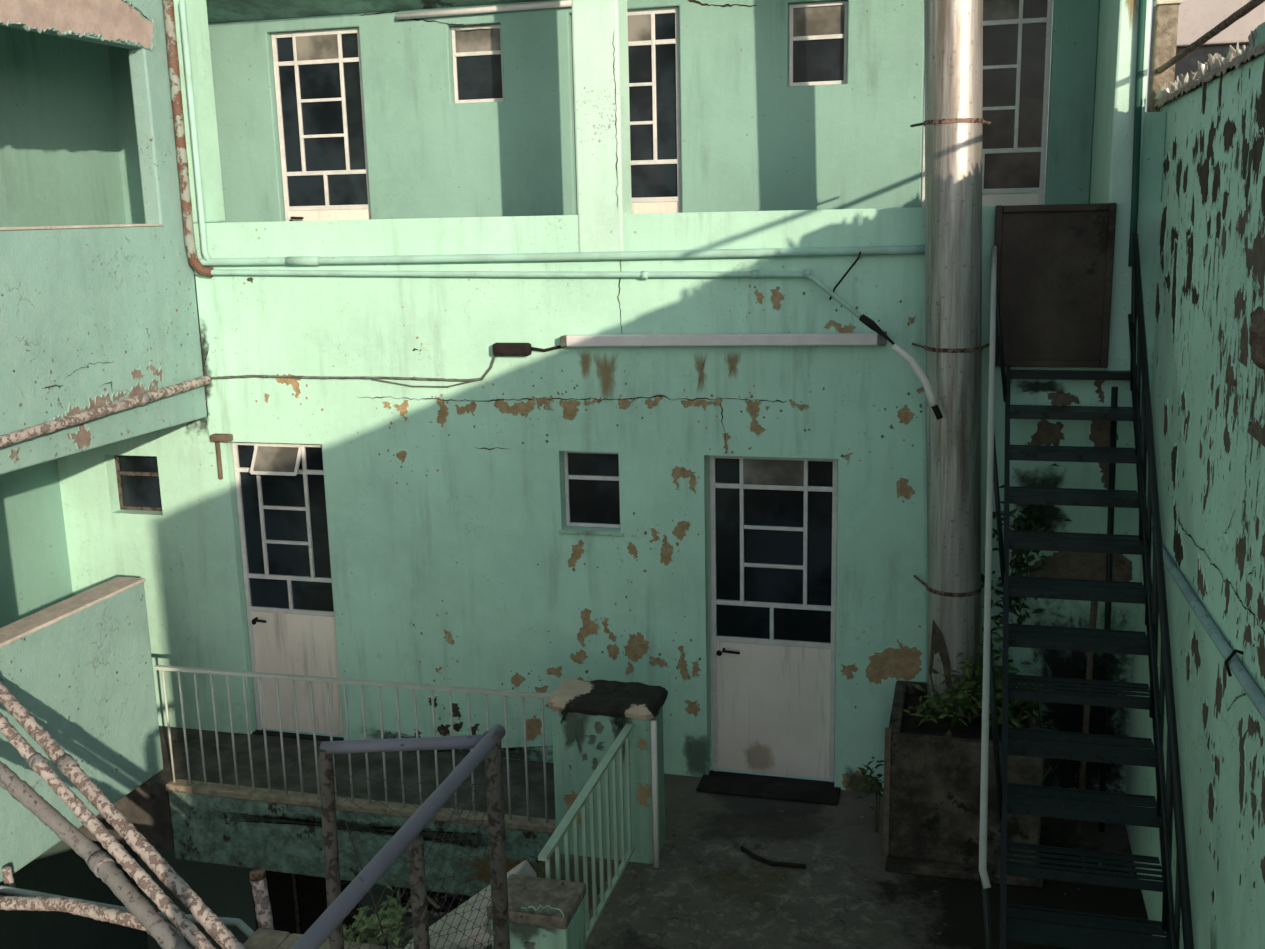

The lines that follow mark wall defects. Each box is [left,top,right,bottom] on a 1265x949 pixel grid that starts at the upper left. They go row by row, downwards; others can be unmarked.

spalling [0,0,155,51]
crack [688,0,757,8]
crack [611,29,619,207]
crack [615,260,623,332]
peeling [482,370,602,426]
crack [358,395,788,454]
peeling [1155,59,1265,889]
peeling [626,512,699,574]
crack [1178,508,1265,635]
peeling [413,600,480,738]
peeling [501,580,703,722]
peeling [839,638,923,685]